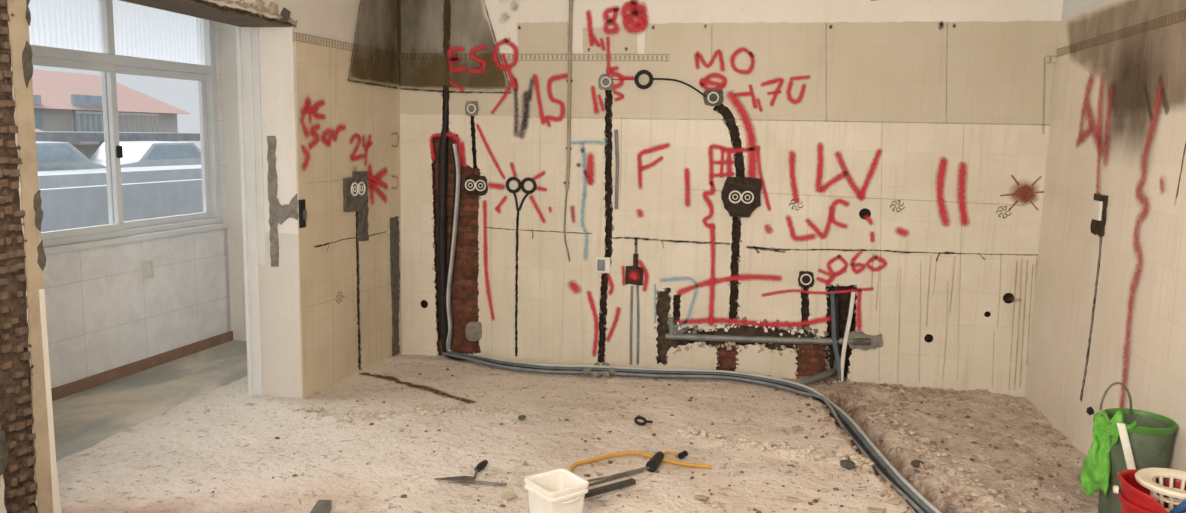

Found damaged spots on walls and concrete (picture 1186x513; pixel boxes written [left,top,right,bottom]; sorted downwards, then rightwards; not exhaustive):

spalling [194,0,298,27]
spalling [22,40,33,88]
water stain [1070,0,1186,135]
spalling [33,190,46,271]